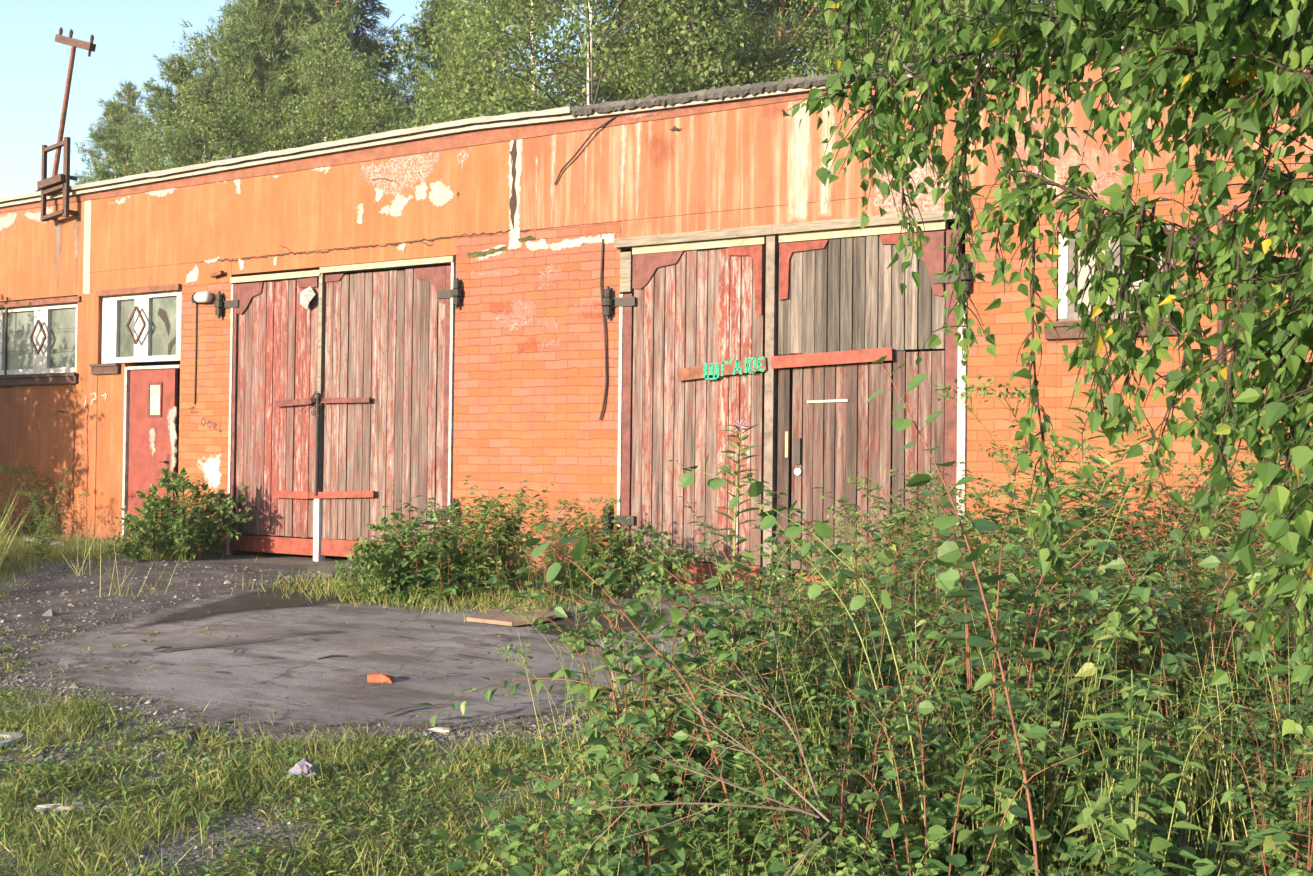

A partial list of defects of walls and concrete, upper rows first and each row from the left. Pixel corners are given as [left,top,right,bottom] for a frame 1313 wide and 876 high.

peeling [0,205,53,231]
crack [200,140,532,263]
peeling [356,152,459,223]
peeling [467,139,614,349]
water stain [789,102,834,219]